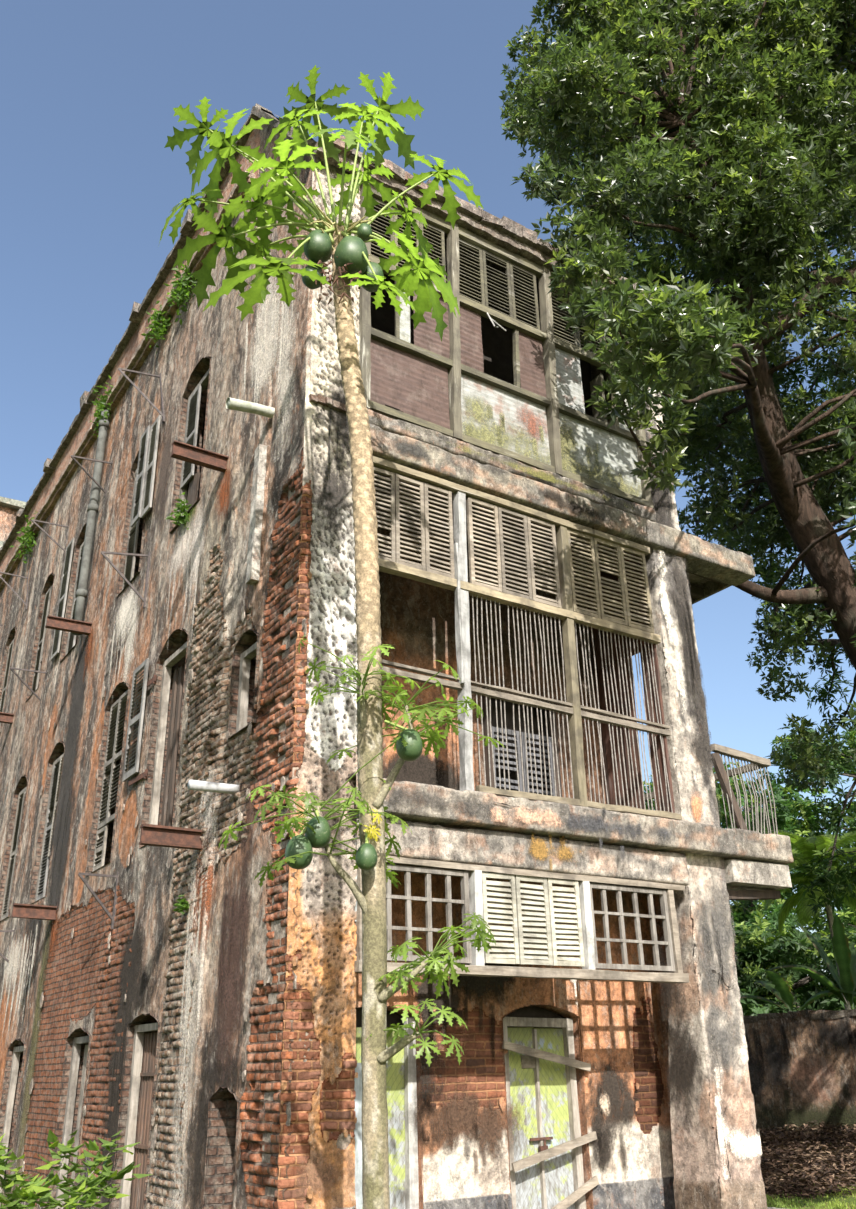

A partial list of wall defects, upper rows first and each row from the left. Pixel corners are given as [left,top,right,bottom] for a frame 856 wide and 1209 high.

water stain [487,405,505,444]
water stain [539,488,609,535]
peeling [118,789,139,869]
flaking render [146,447,358,1209]
flaking render [22,686,135,1206]
water stain [176,793,215,1129]
water stain [218,797,254,1091]
flaking render [420,1007,540,1111]
flaking render [632,997,665,1134]
water stain [820,1014,856,1055]
water stain [596,1085,627,1169]